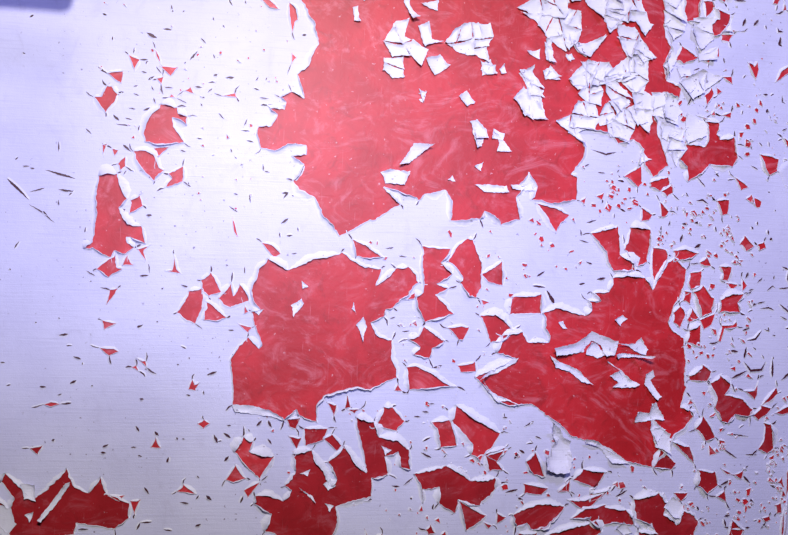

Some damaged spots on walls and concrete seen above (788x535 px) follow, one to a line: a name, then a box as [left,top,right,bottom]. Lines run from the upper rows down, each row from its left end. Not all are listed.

peeling [82,41,205,278]
peeling [171,0,788,535]
peeling [100,285,122,305]
peeling [97,319,117,330]
peeling [90,344,119,365]
peeling [125,352,156,377]
peeling [0,468,141,535]